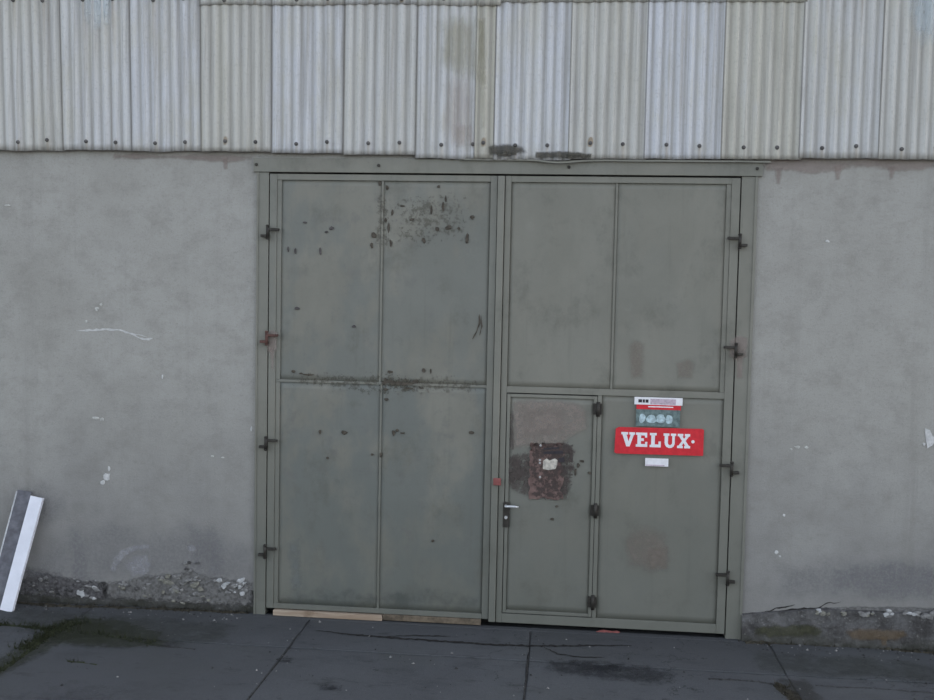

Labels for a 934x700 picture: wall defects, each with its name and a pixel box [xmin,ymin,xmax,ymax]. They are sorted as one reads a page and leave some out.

flaking render [21,561,252,606]